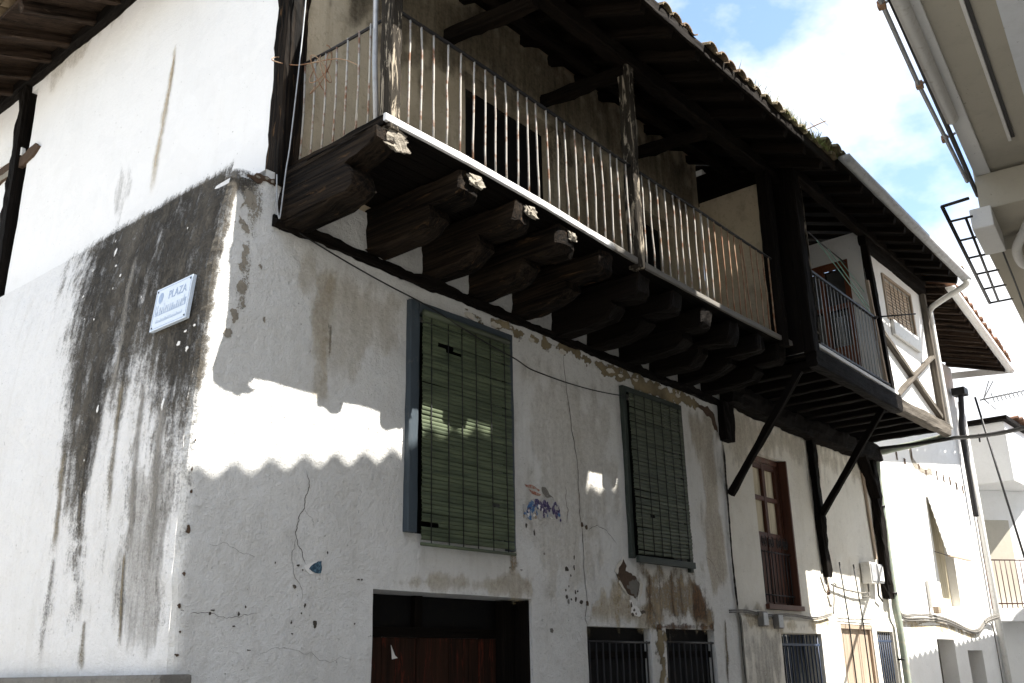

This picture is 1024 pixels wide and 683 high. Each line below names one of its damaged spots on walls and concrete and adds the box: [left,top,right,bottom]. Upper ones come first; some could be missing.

water stain [53,162,257,665]
spalling [464,309,718,432]
crack [292,475,314,601]
crack [563,355,617,623]
spalling [615,557,646,617]